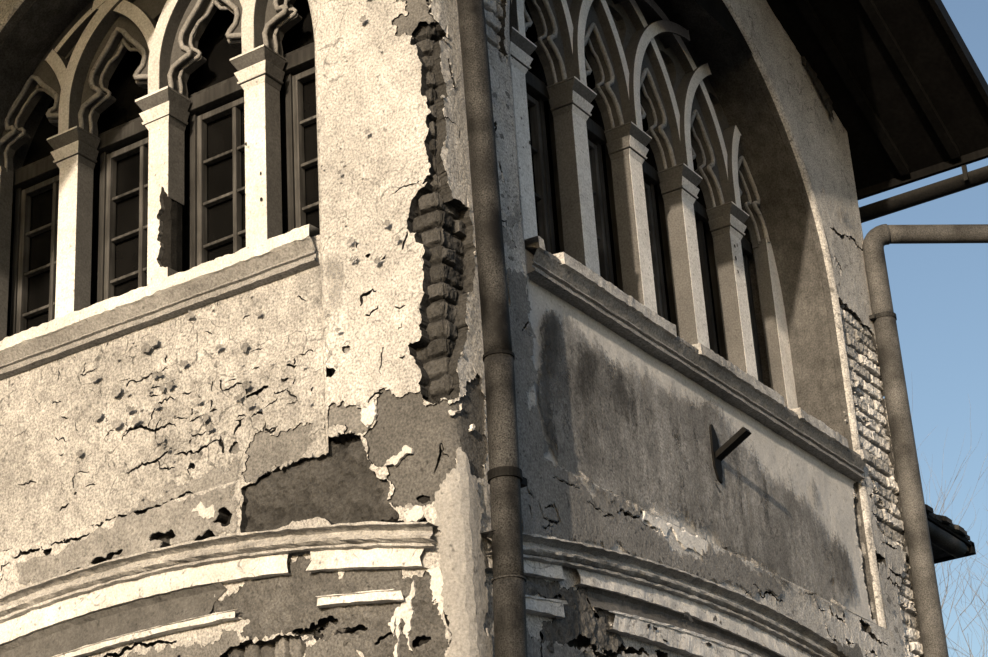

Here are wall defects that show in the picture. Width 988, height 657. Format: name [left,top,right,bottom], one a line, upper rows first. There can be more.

flaking render [484,0,513,63]
peeling [16,0,486,584]
flaking render [115,555,449,657]
flaking render [524,575,634,657]
water stain [538,309,857,612]
flaking render [834,305,923,657]